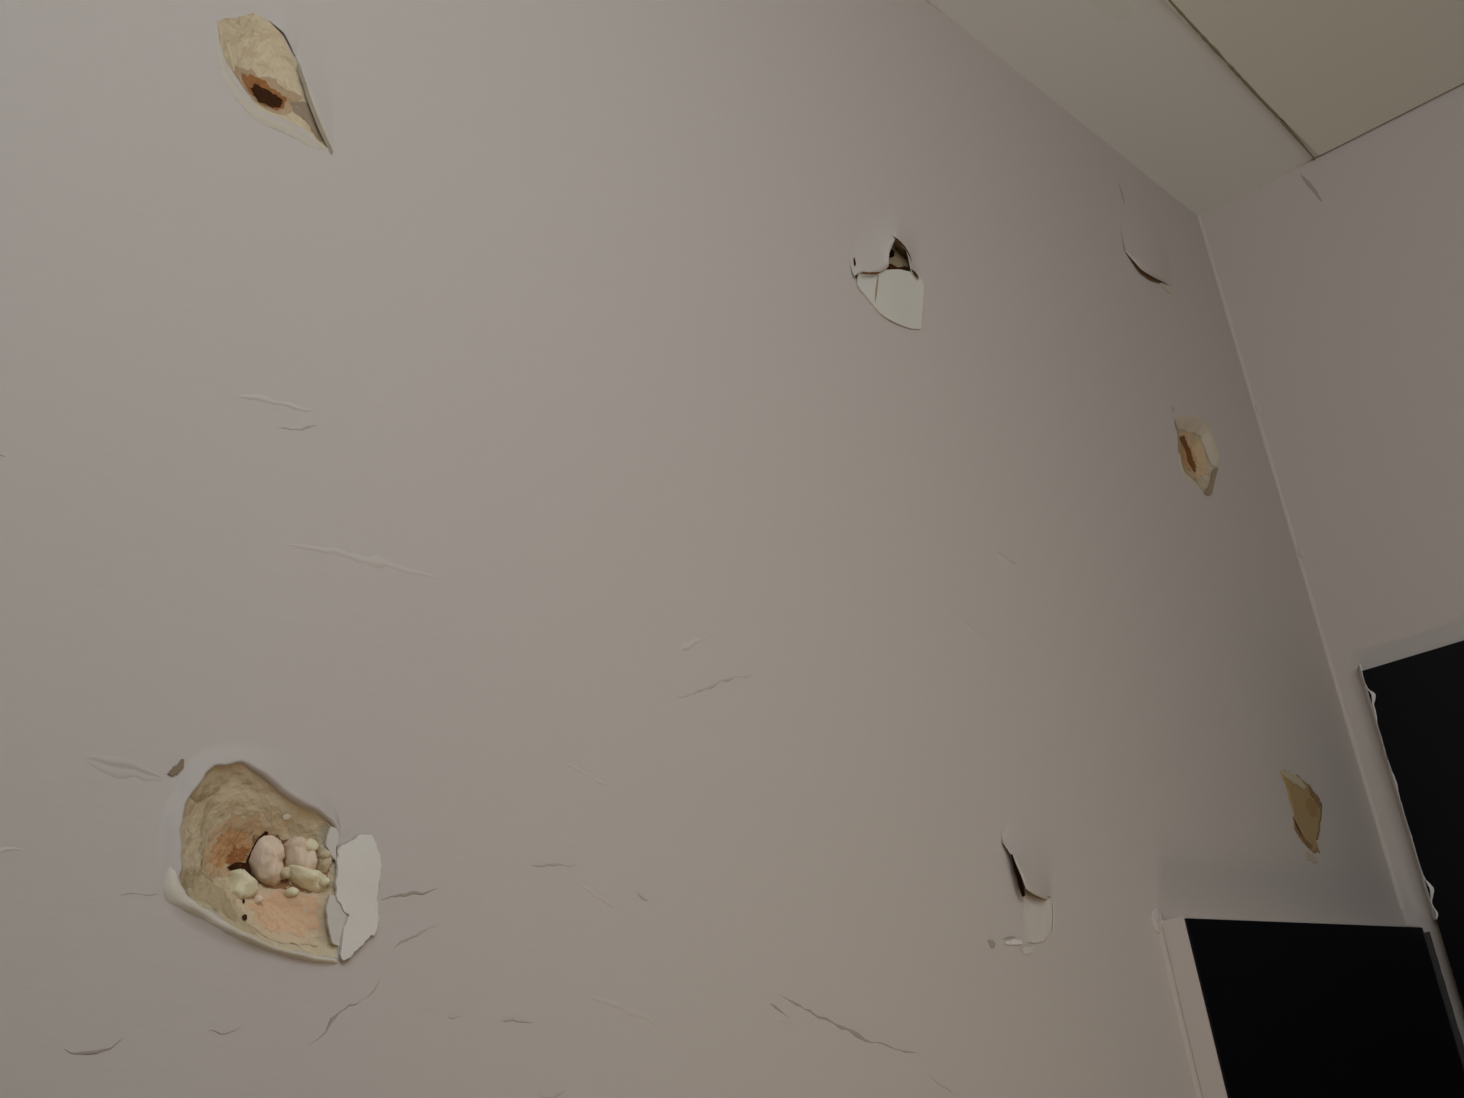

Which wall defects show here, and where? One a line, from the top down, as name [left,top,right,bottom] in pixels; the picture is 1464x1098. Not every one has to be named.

spalling [216,1,334,154]
hole [849,205,924,330]
spalling [1173,415,1220,496]
spalling [153,740,381,967]
crack [770,995,954,1094]